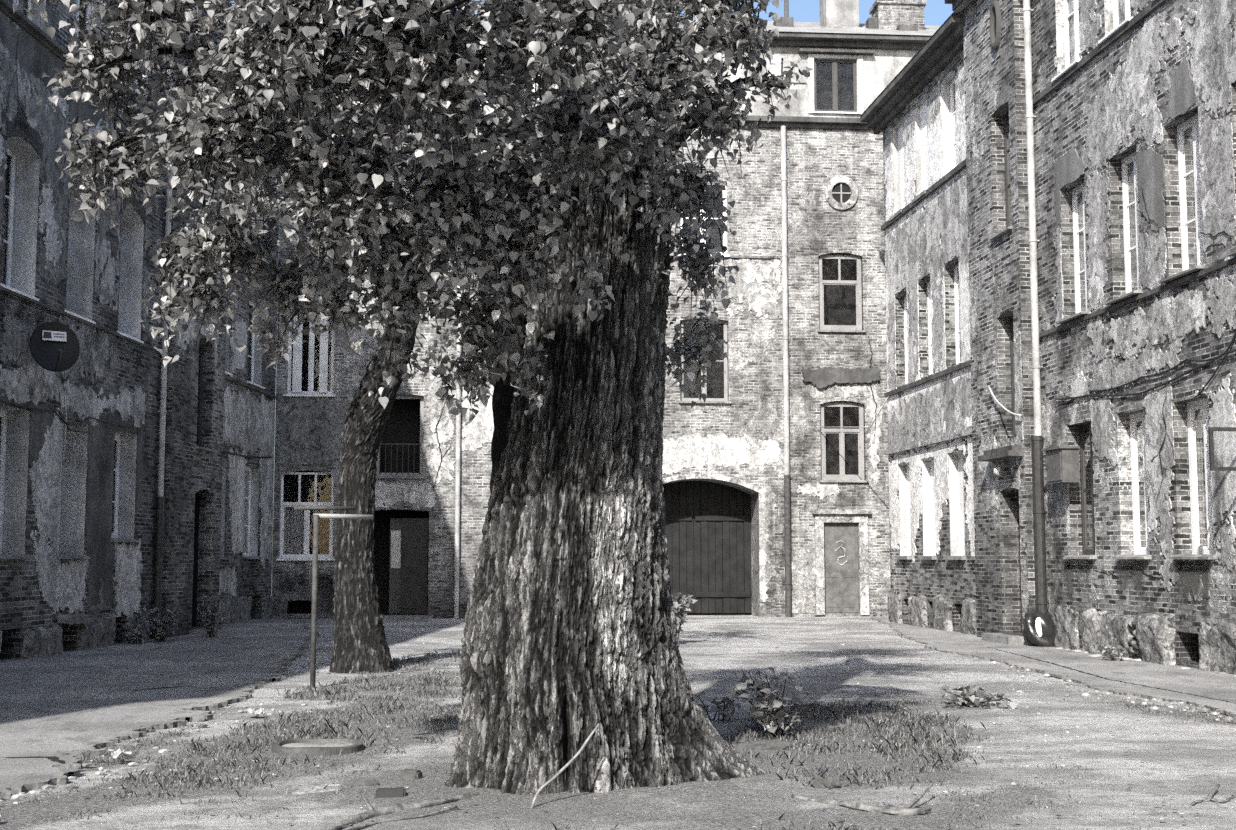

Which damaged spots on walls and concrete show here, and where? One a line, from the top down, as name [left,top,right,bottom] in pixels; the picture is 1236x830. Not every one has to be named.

peeling [0,11,156,311]
peeling [1051,0,1236,591]
peeling [0,304,146,618]
peeling [662,432,782,605]
peeling [791,544,816,613]
peeling [1186,575,1211,611]